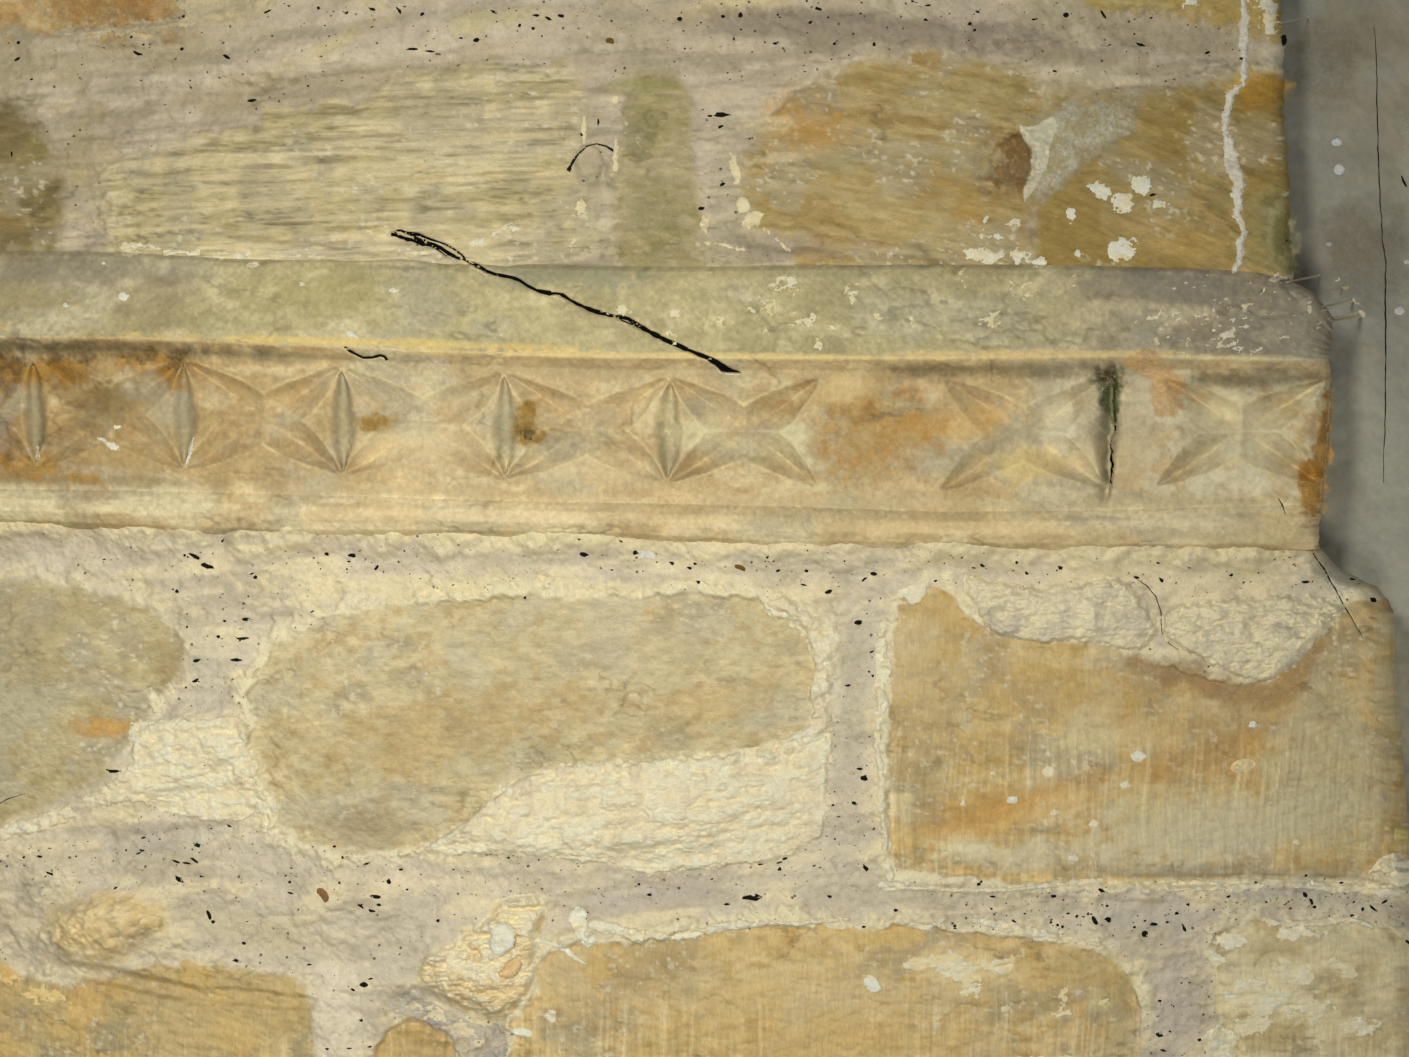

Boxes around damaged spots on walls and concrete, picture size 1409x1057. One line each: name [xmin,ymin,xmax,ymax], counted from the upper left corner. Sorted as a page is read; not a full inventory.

crack [391,229,741,375]
damp [1135,0,1366,358]